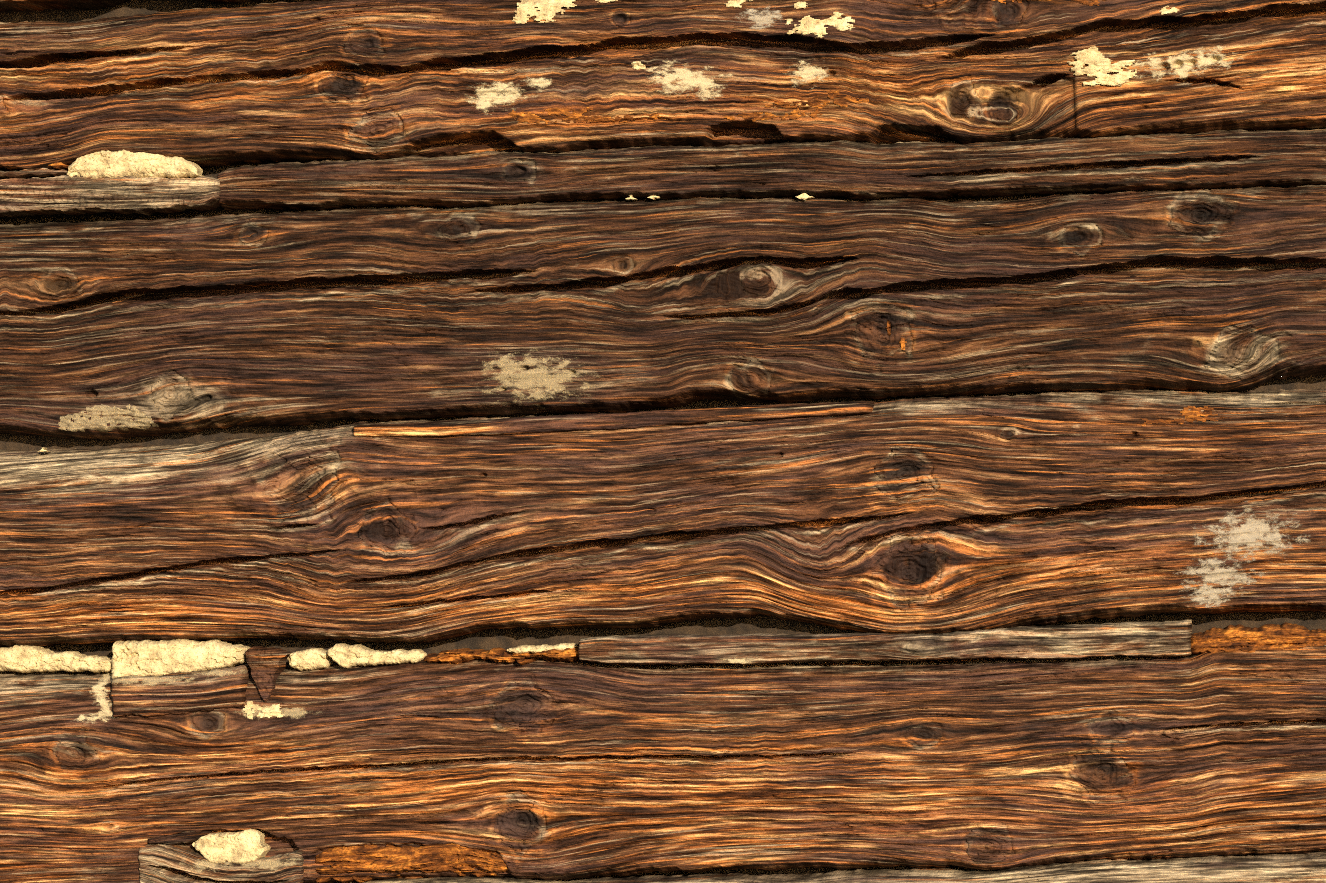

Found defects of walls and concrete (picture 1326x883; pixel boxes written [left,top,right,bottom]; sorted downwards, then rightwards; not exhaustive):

efflorescence [738,7,782,30]
damp [1131,46,1242,79]